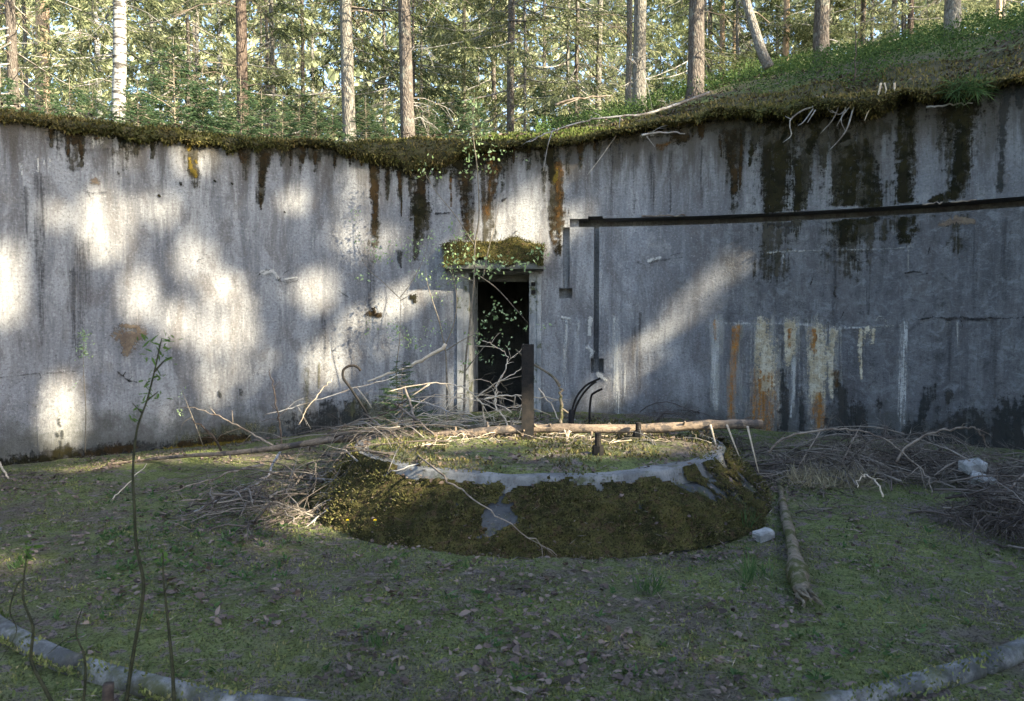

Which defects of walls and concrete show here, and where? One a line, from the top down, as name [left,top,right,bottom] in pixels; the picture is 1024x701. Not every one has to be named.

corrosion [706,314,842,436]
water stain [823,295,1024,450]